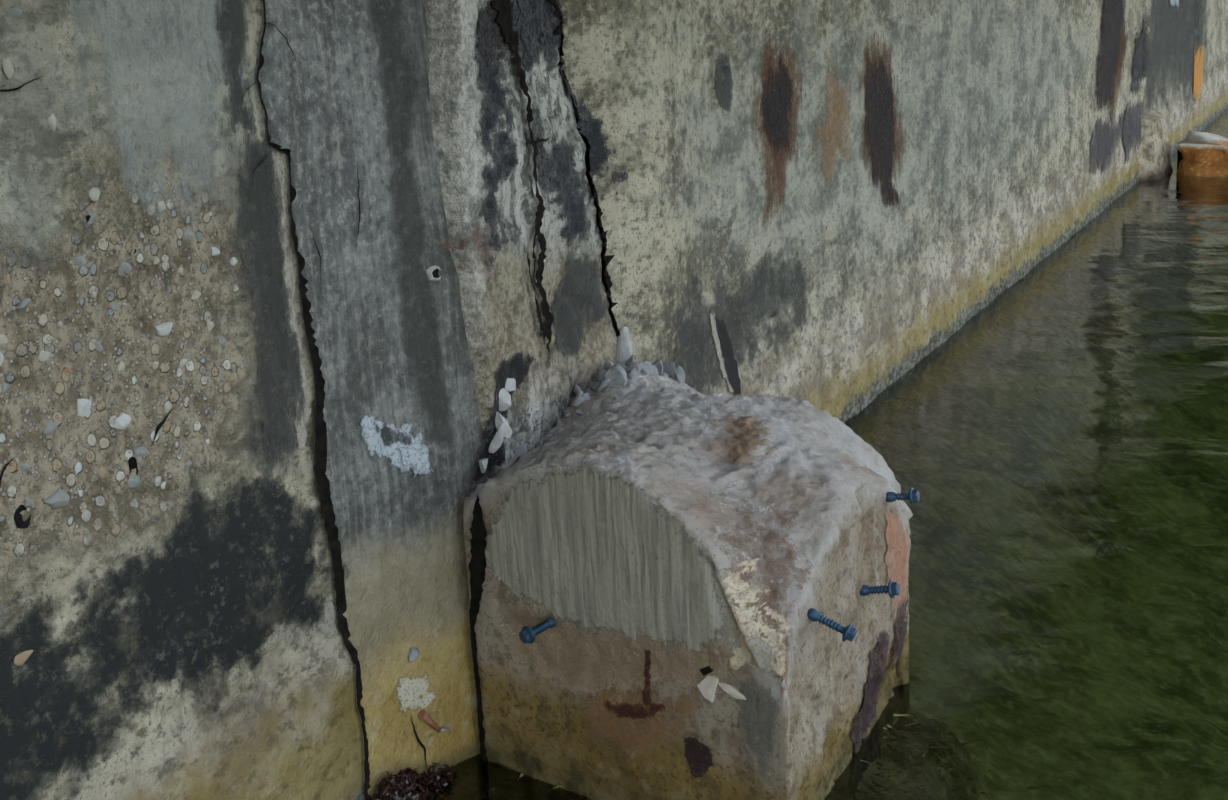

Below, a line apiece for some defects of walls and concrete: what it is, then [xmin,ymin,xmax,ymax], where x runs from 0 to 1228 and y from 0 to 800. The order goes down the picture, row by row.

crack [0,76,43,92]
rust [748,39,803,225]
rust [859,32,906,211]
crack [237,0,373,800]
crack [469,0,620,800]
rust [604,650,666,720]